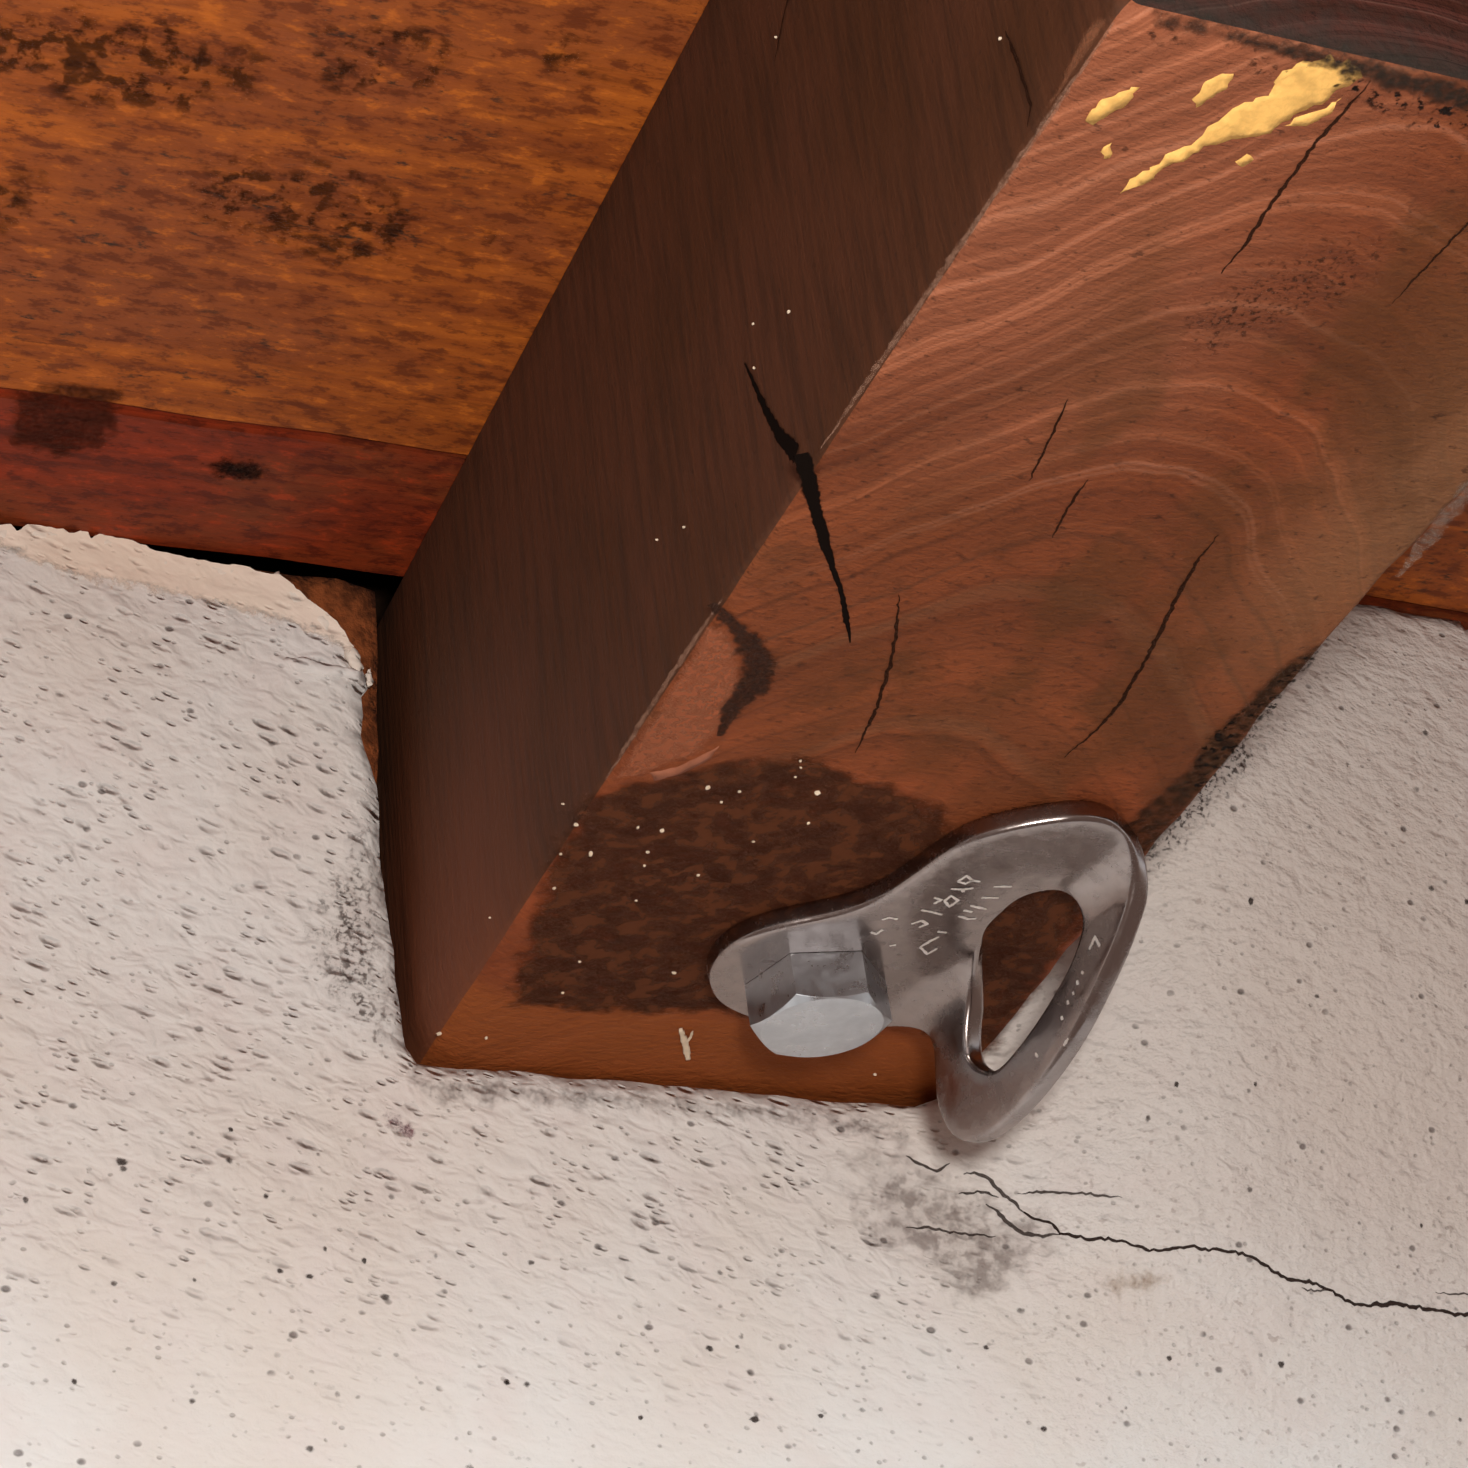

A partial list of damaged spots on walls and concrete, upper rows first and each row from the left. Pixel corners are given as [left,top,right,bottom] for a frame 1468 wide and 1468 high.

leakage [0,21,258,110]
leakage [205,172,404,259]
spalling [1101,143,1112,159]
spalling [1086,87,1140,125]
spalling [1121,54,1363,193]
crack [1221,80,1371,274]
crack [1392,222,1468,304]
crack [855,595,900,753]
crack [1064,535,1218,758]
leakage [517,759,946,1016]
leakage [981,890,1079,1052]
crack [906,1156,1468,1317]